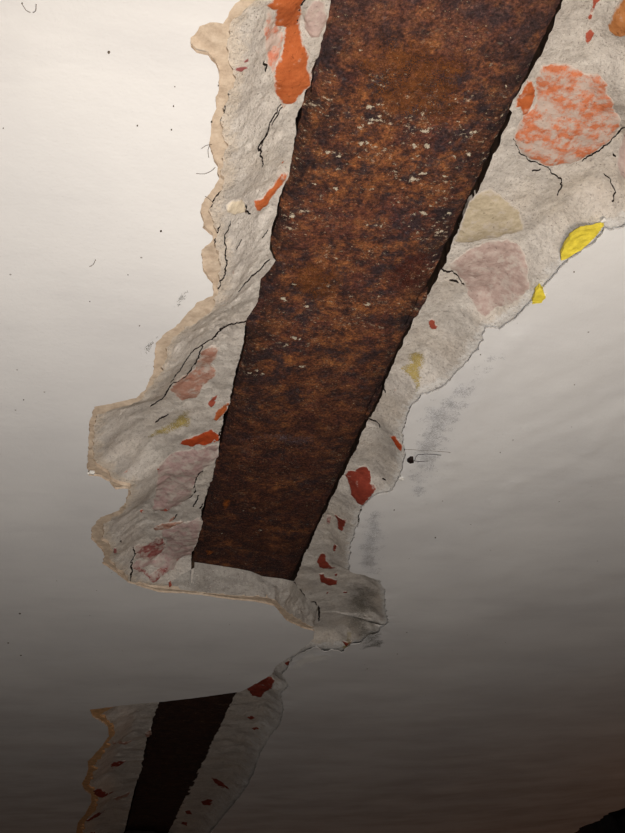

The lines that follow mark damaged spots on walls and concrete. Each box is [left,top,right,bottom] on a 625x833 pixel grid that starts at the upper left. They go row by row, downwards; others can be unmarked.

crack [257,104,283,167]
crack [513,139,563,196]
crack [582,127,625,162]
flaking render [87,0,625,629]
crack [150,320,247,423]
flaking render [77,702,159,833]
flaking render [168,610,384,833]
flaking render [575,808,625,833]